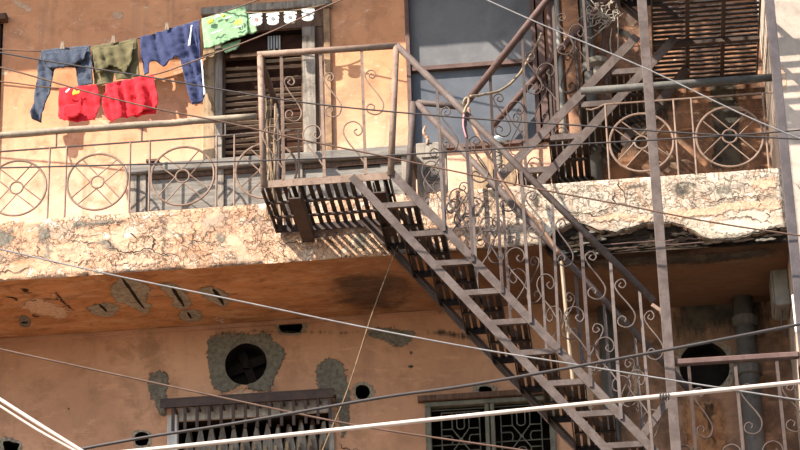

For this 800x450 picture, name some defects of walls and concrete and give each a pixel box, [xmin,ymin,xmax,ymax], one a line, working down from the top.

crack [532,180,639,224]
crack [700,194,779,224]
crack [240,215,336,257]
crack [0,220,234,301]
peeling [19,294,73,327]
leakage [340,276,403,309]